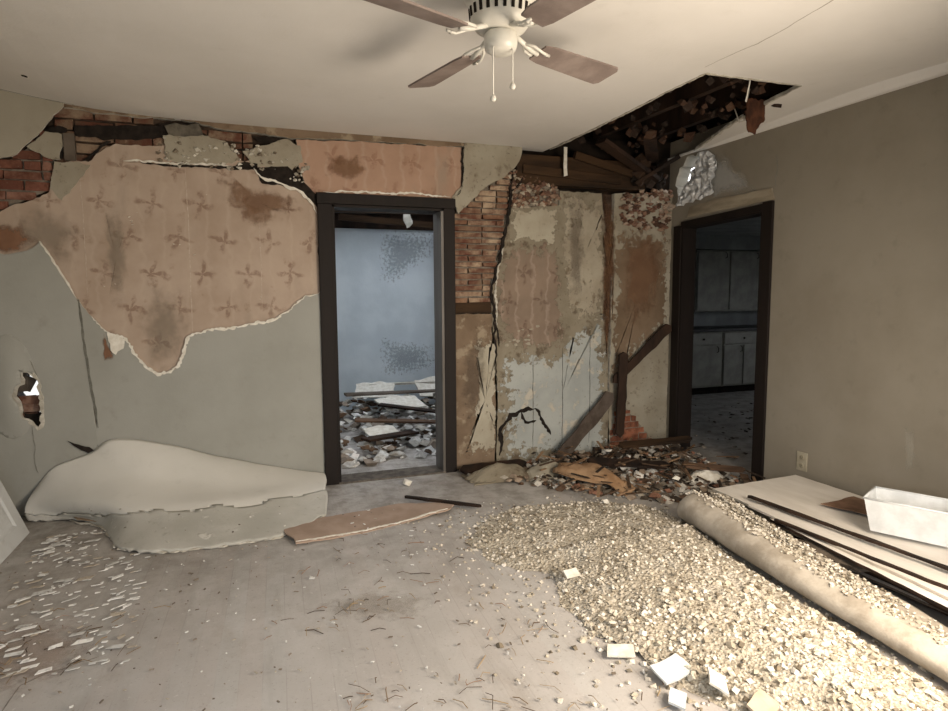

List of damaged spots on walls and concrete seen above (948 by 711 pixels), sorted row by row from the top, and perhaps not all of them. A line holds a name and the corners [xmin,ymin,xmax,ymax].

spalling [12,370,45,431]
peeling [0,108,464,376]
crack [490,171,524,378]
crack [498,406,551,455]
peeling [455,169,676,460]